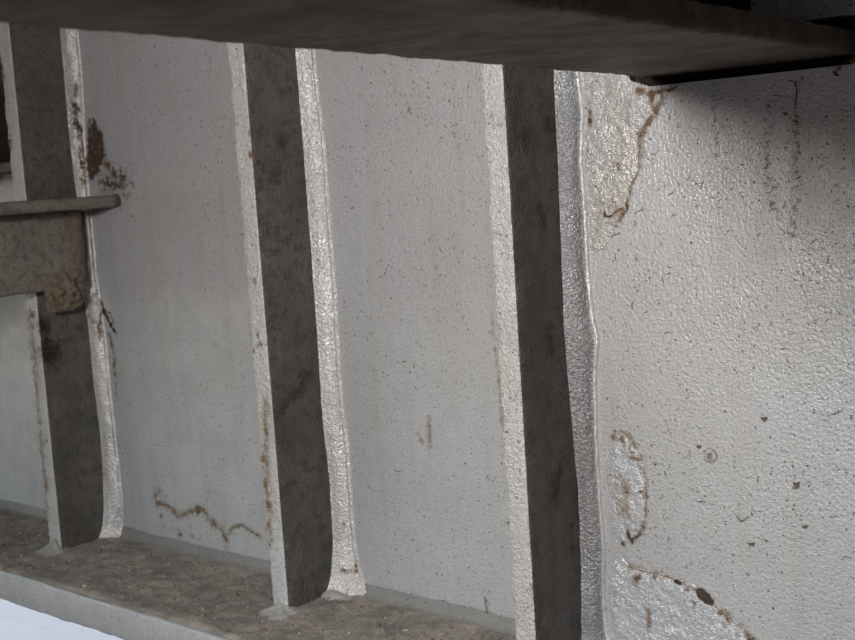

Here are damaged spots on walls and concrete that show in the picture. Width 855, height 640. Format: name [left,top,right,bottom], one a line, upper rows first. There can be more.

corrosion [71,83,133,197]
crack [154,491,259,542]